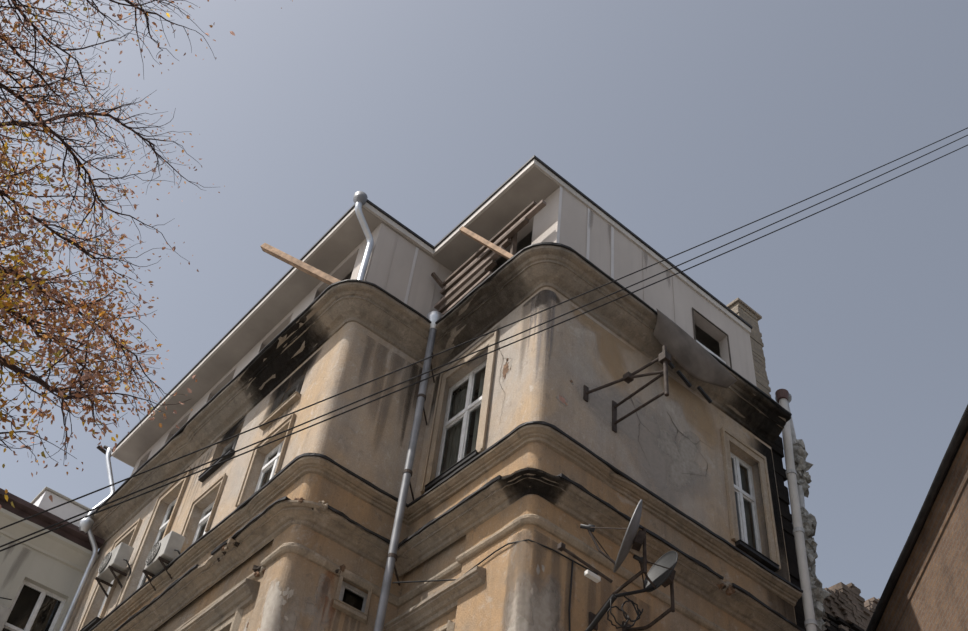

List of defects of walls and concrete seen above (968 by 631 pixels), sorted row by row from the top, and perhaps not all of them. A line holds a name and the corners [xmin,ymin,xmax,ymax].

water stain [406,364,423,415]
water stain [498,467,569,504]